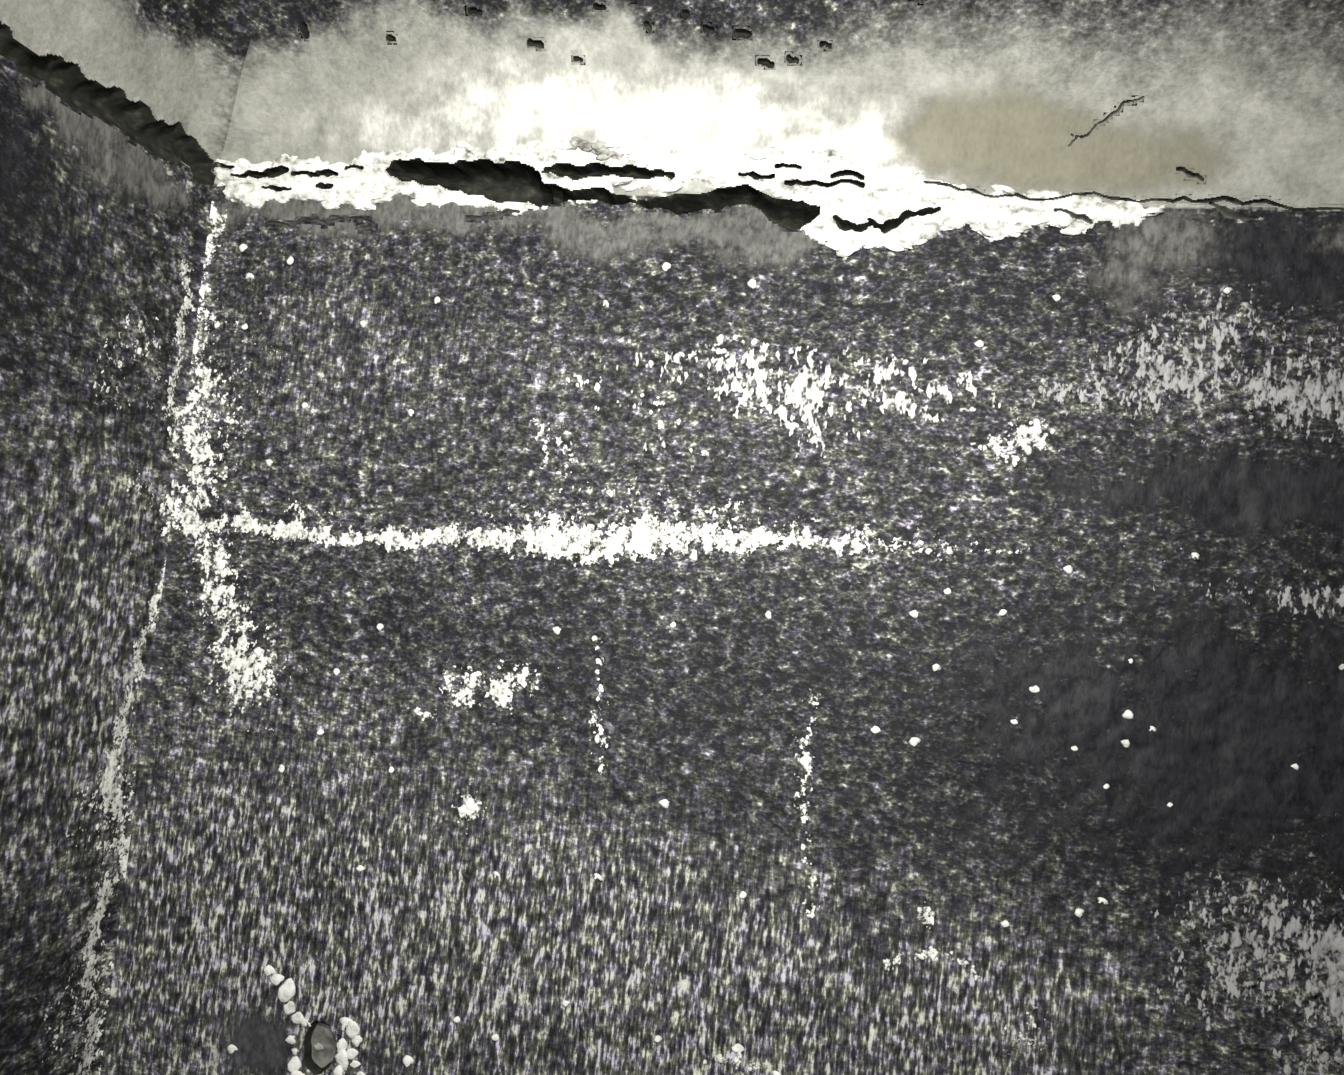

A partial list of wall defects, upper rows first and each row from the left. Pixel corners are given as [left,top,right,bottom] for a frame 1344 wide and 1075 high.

spalling [527,38,544,49]
spalling [733,29,753,39]
spalling [757,54,799,68]
spalling [25,82,190,209]
crack [0,15,1344,236]
spalling [219,193,814,266]
leakage [1192,207,1344,331]
leakage [83,46,1216,716]
leakage [1036,442,1344,557]
leakage [589,635,610,775]
leakage [927,561,1344,908]
leakage [452,793,487,834]